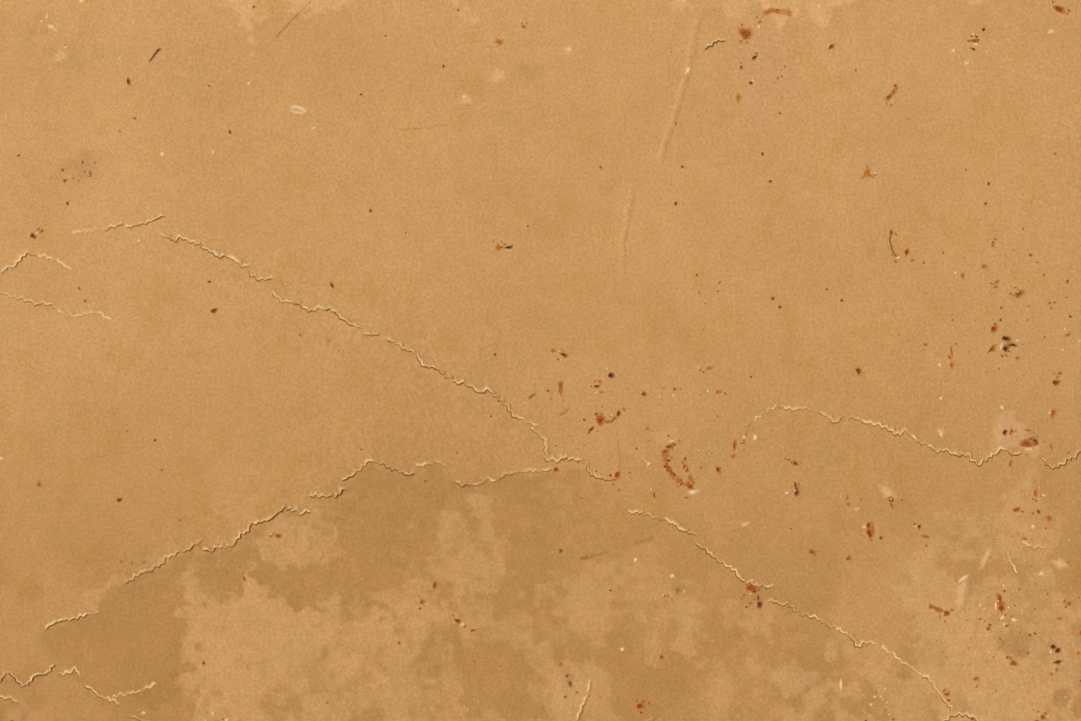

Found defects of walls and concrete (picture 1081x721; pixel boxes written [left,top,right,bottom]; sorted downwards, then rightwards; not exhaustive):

peeling [35,444,896,721]
corrosion [660,434,702,499]
peeling [861,402,1081,721]